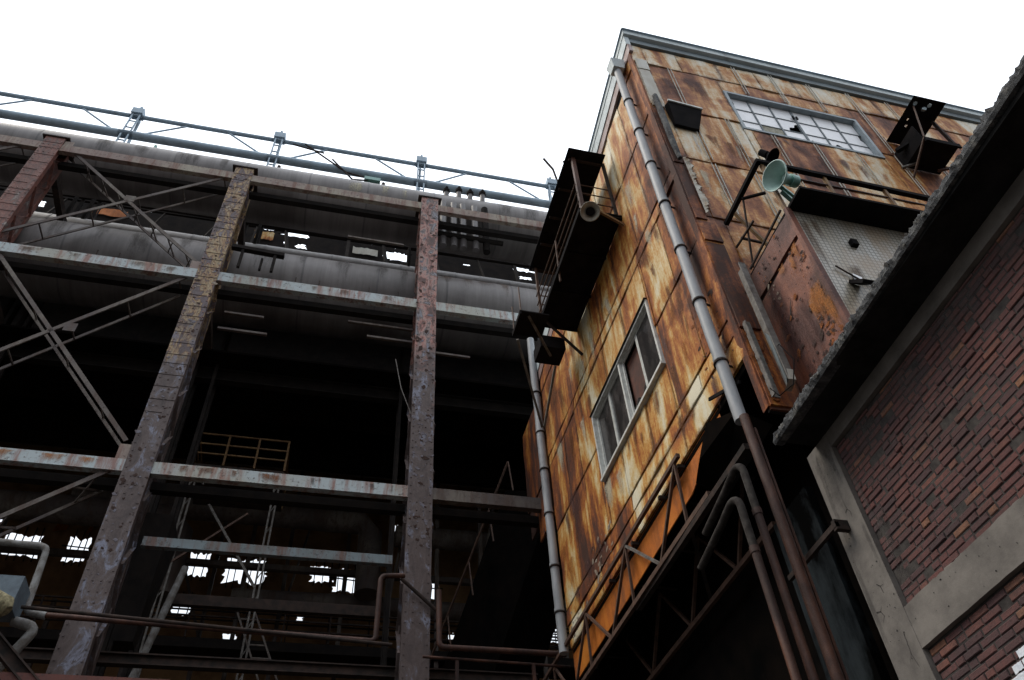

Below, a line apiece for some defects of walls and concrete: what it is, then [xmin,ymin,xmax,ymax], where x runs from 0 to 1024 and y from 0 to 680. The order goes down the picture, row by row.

corrosion [666,285,716,394]
corrosion [758,221,844,377]